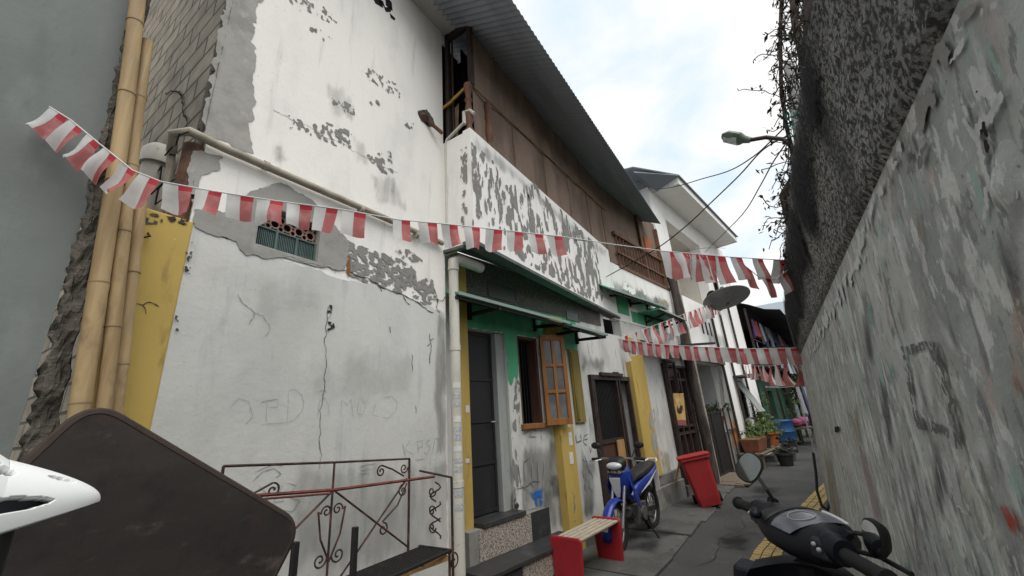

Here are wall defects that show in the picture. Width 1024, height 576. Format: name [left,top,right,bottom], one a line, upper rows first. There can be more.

spalling [17,168,107,462]
spalling [95,29,126,154]
flaking render [187,150,223,194]
flaking render [202,0,264,153]
peeling [288,115,352,148]
peeling [367,151,394,174]
peeling [365,68,401,106]
peeling [346,240,439,305]
peeling [460,142,603,301]
crack [319,307,332,460]